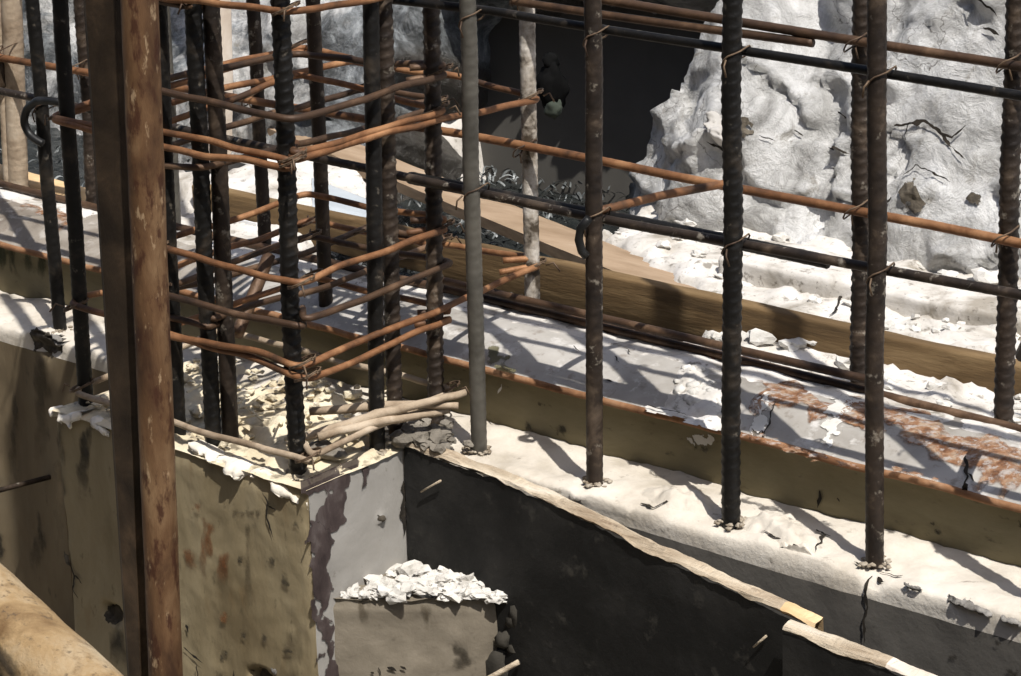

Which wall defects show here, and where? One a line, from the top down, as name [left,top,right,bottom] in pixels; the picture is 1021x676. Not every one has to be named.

crack [894,119,965,159]
crack [904,164,952,183]
spalling [159,0,1021,570]
rust [749,380,865,430]
damp [78,430,89,475]
rust [742,433,857,467]
rust [884,407,1021,499]
peeling [169,300,404,676]
crack [854,561,902,642]
spalling [948,594,1021,627]